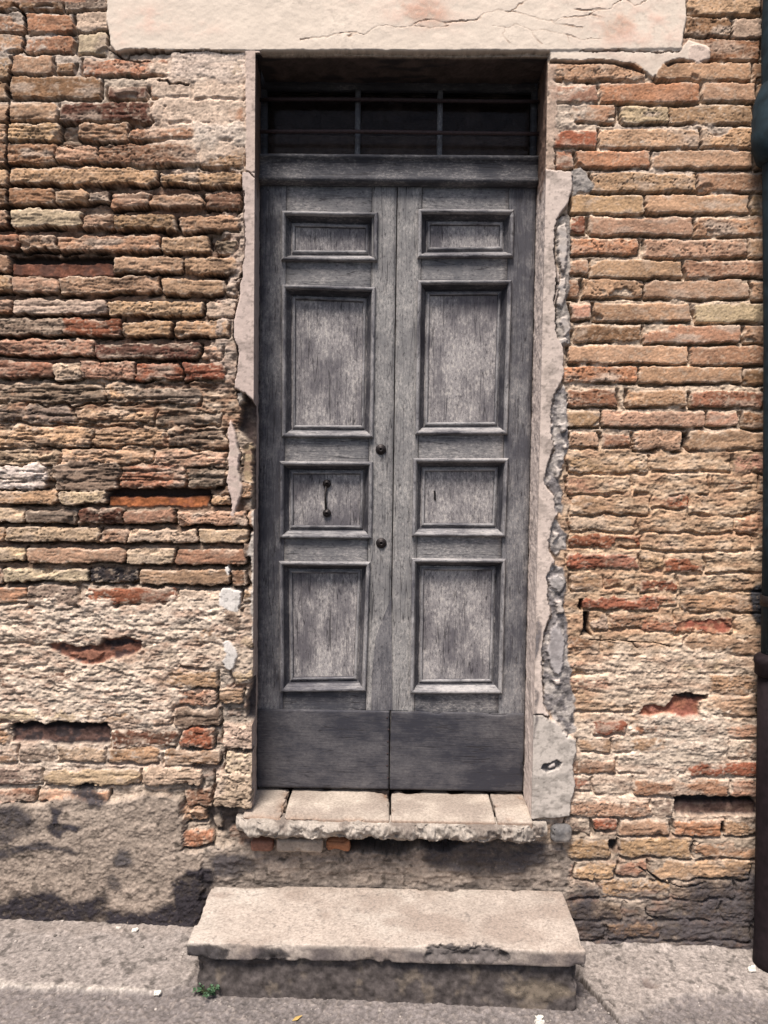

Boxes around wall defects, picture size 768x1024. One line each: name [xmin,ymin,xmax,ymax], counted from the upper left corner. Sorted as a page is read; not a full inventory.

crack [299,0,680,54]
peeling [555,214,572,348]
flaking render [236,390,257,510]
peeling [541,385,577,738]
spalling [47,635,143,666]
spalling [639,692,708,718]
spalling [10,720,112,746]
peeling [541,760,562,773]
spalling [424,941,510,964]